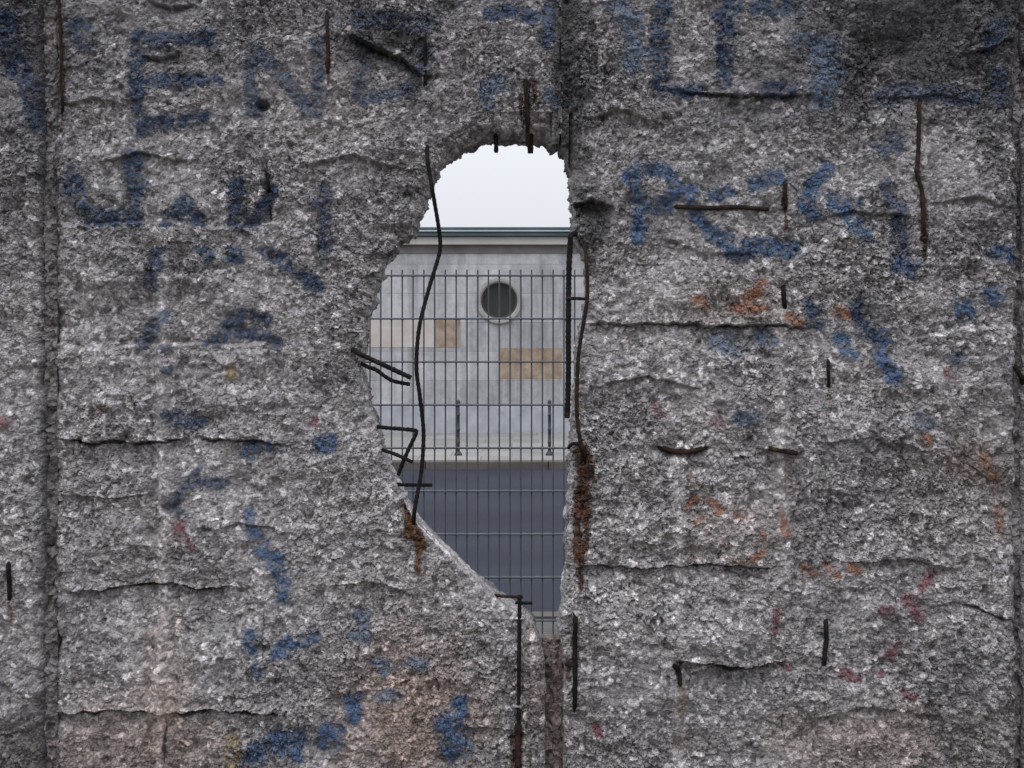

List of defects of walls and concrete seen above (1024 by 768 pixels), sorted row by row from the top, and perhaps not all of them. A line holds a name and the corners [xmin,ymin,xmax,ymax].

spalling [446,111,564,157]
spalling [353,187,423,313]
corrosion [920,199,928,261]
crack [591,320,793,336]
crack [72,439,280,467]
corrosion [403,502,426,573]
corrosion [573,443,594,592]
crack [101,579,225,592]
spalling [402,525,524,630]
crack [710,661,776,671]
crack [62,709,275,764]